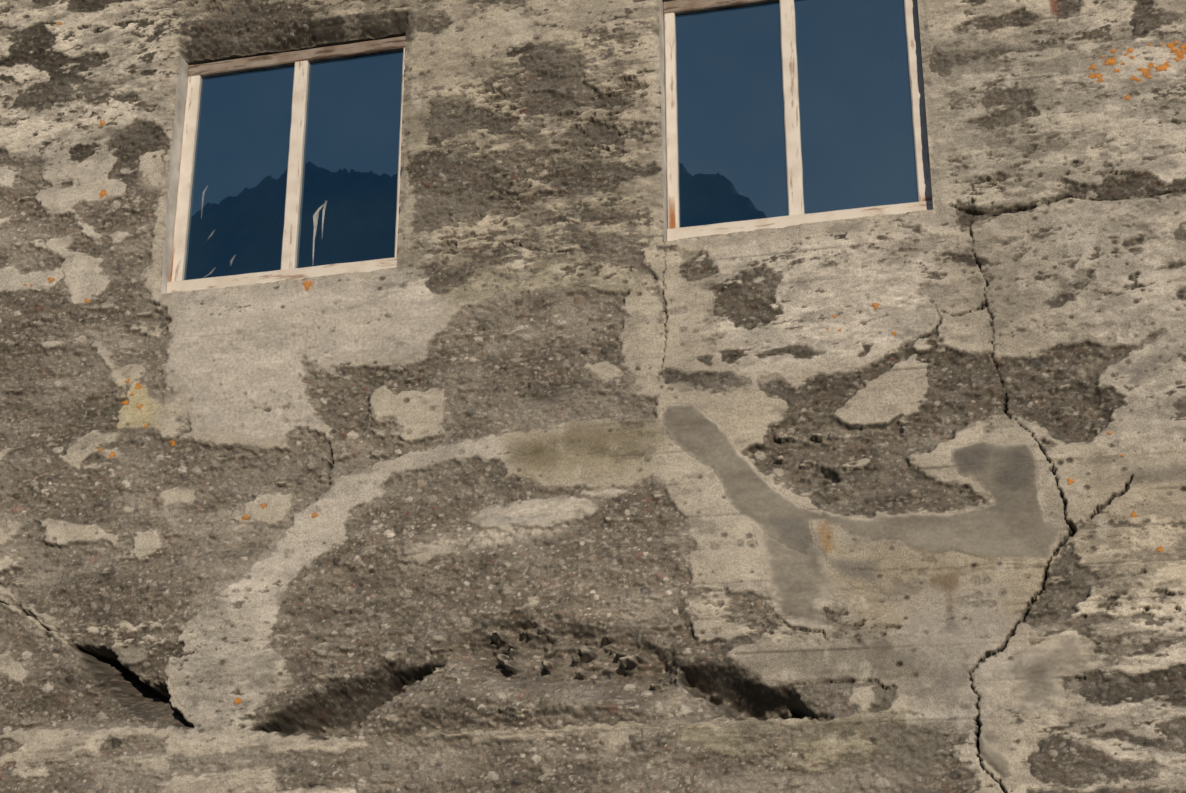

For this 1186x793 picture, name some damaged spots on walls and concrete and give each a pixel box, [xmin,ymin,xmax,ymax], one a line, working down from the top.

spalling [0,0,137,110]
spalling [407,42,638,235]
spalling [964,84,1040,130]
spalling [955,157,1186,233]
crack [657,251,668,381]
spalling [1041,246,1100,310]
spalling [0,120,981,793]
spalling [657,329,1165,518]
crack [850,191,1184,793]
crack [0,583,74,644]
spalling [1017,539,1126,629]
spalling [1026,663,1186,793]